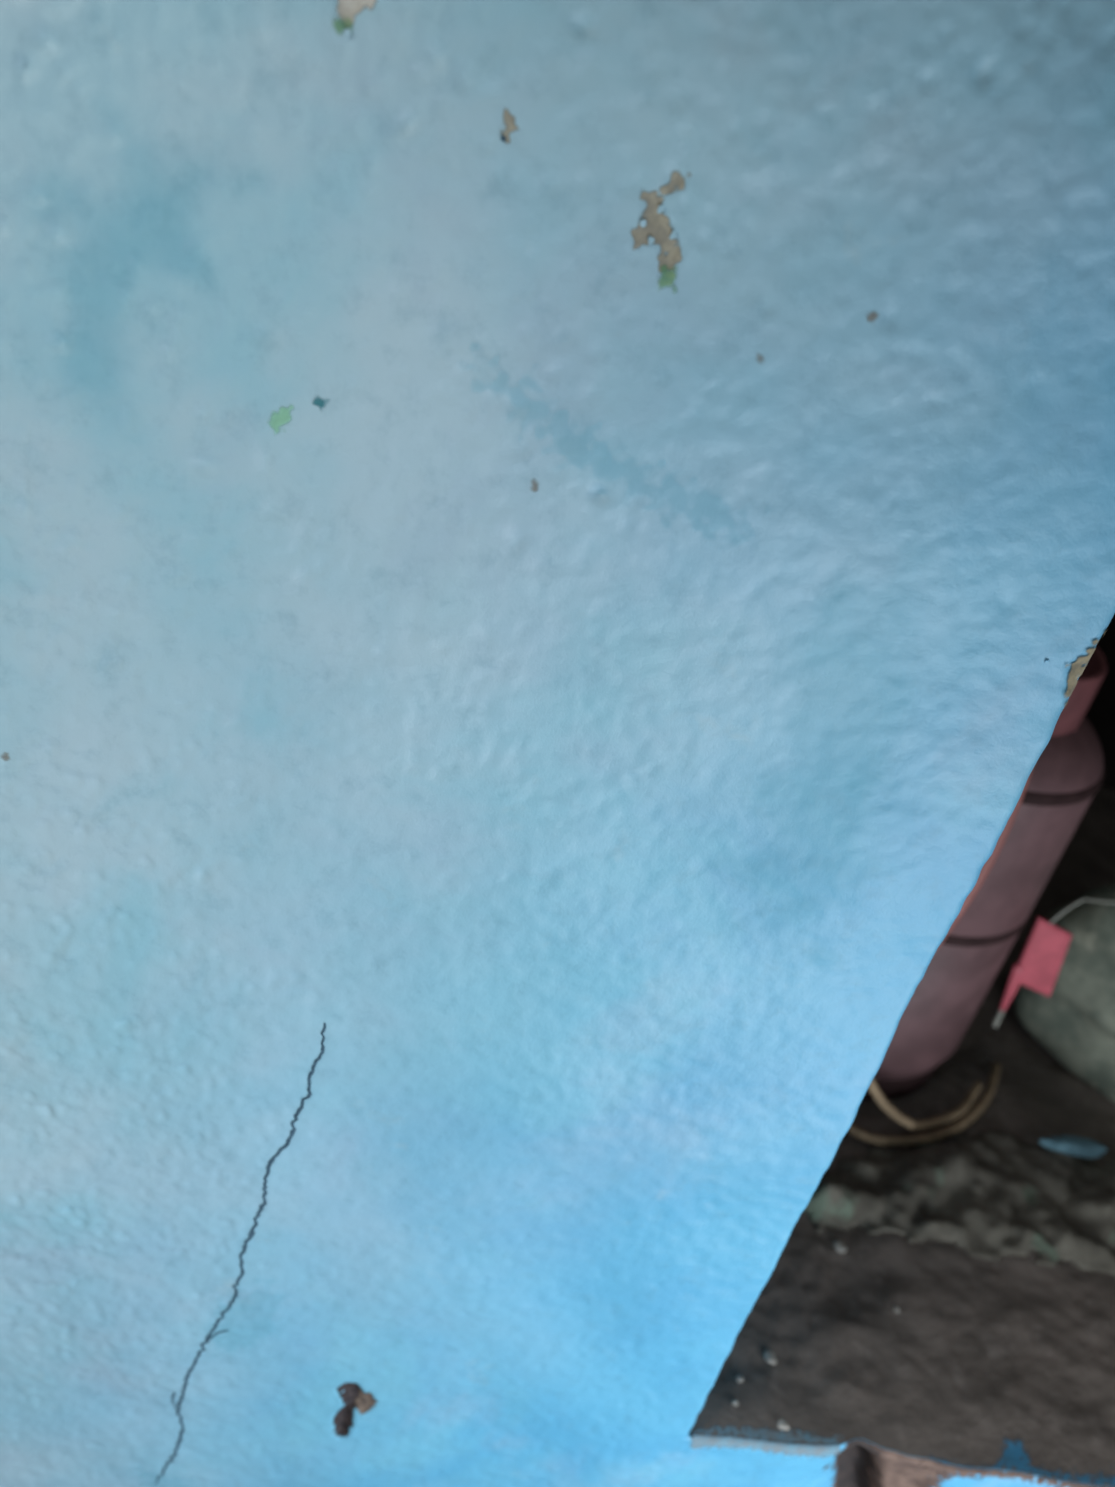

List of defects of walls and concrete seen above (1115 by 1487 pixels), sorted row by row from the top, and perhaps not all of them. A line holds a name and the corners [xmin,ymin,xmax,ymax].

peeling [334,0,376,37]
peeling [501,109,518,143]
peeling [631,172,685,291]
crack [155,1023,326,1485]
spalling [333,1382,378,1437]